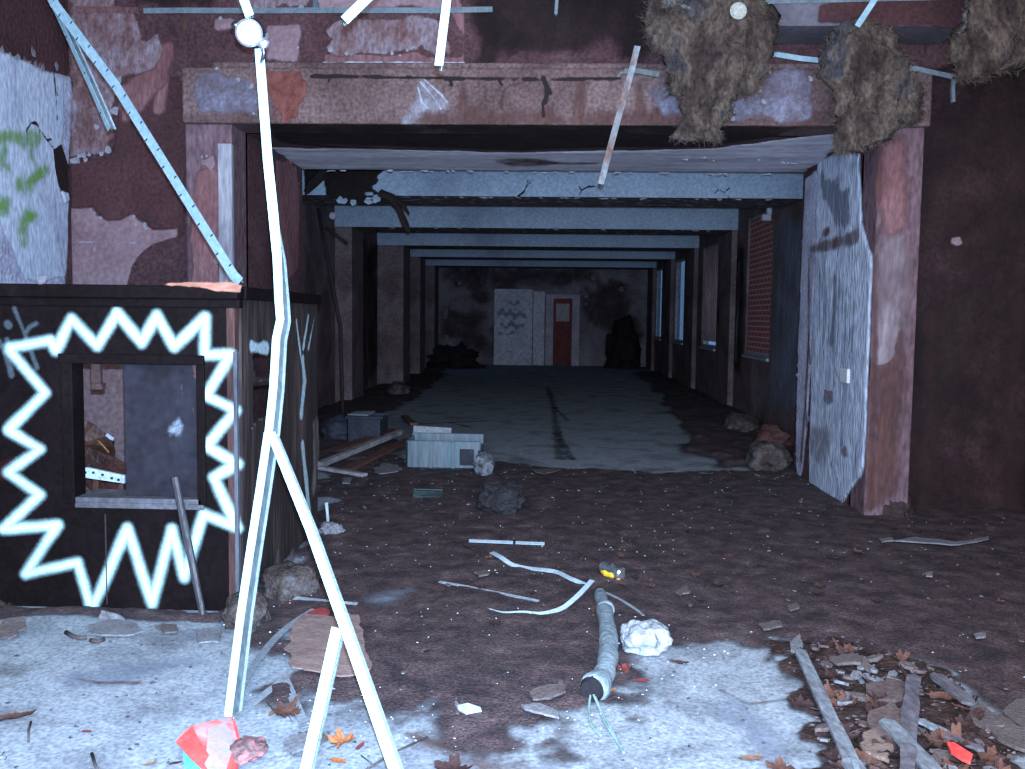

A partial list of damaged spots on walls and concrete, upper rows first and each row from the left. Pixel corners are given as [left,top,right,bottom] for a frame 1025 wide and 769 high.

spalling [0,0,241,292]
flaking render [195,67,258,115]
flaking render [214,0,465,63]
peeling [272,134,907,503]